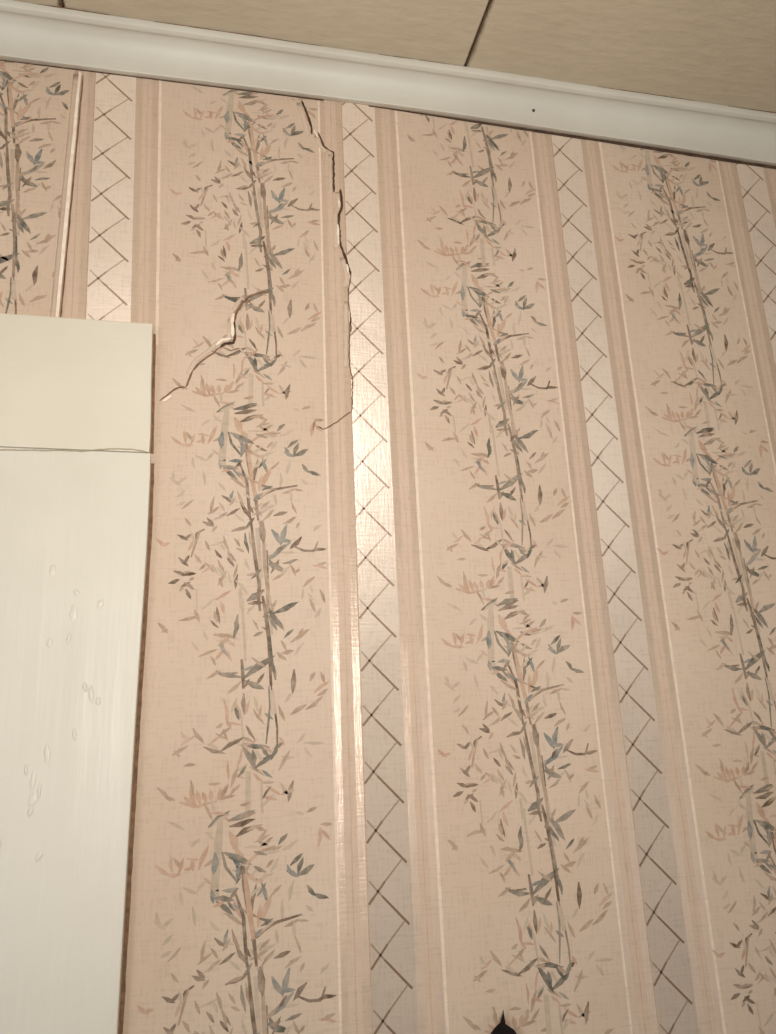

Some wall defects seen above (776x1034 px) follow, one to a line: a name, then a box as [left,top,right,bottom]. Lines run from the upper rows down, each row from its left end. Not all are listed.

crack [38,4,108,15]
crack [155,21,319,46]
crack [596,86,699,102]
crack [369,105,776,169]
crack [0,60,353,430]
crack [0,291,269,1034]